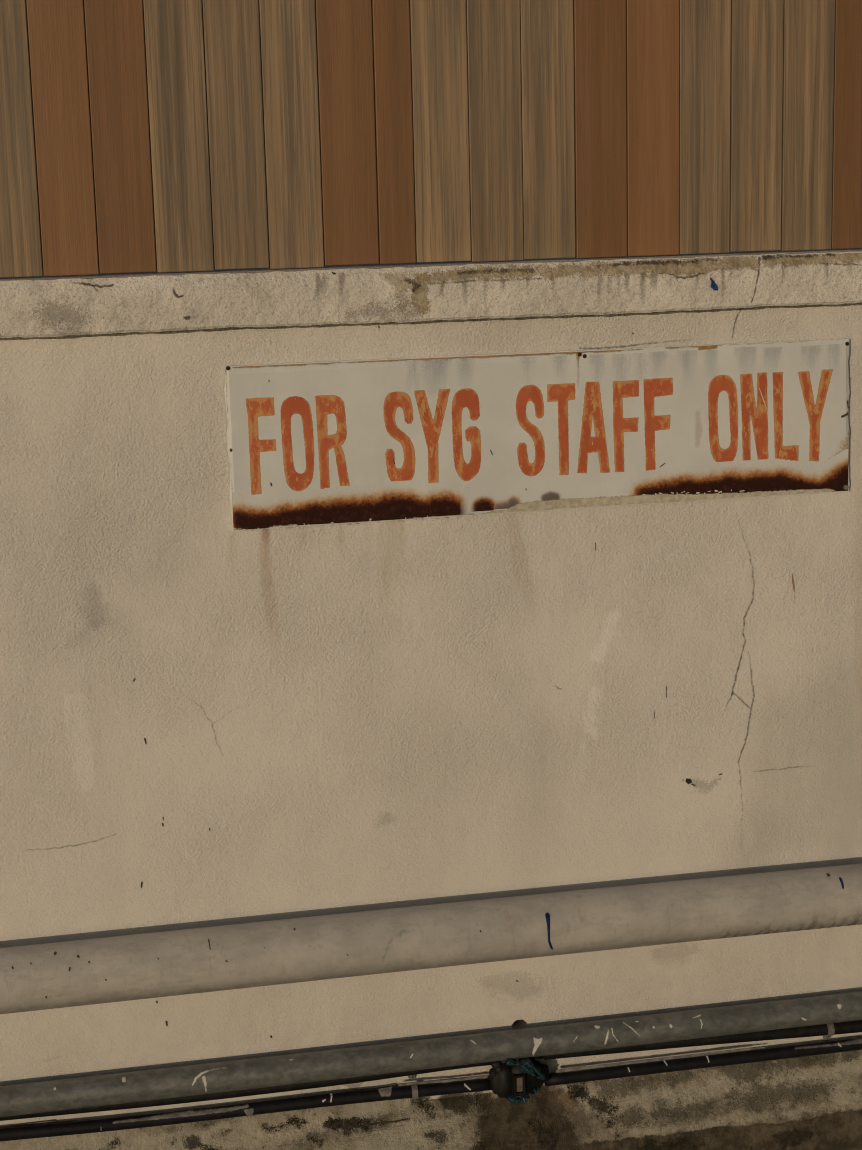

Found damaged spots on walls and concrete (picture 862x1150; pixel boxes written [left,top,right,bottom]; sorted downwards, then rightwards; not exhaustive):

water stain [406,253,862,292]
crack [732,257,761,338]
crack [731,576,755,760]
water stain [171,1135,217,1150]
water stain [262,1115,385,1147]
water stain [411,1070,708,1150]
water stain [718,1050,861,1113]